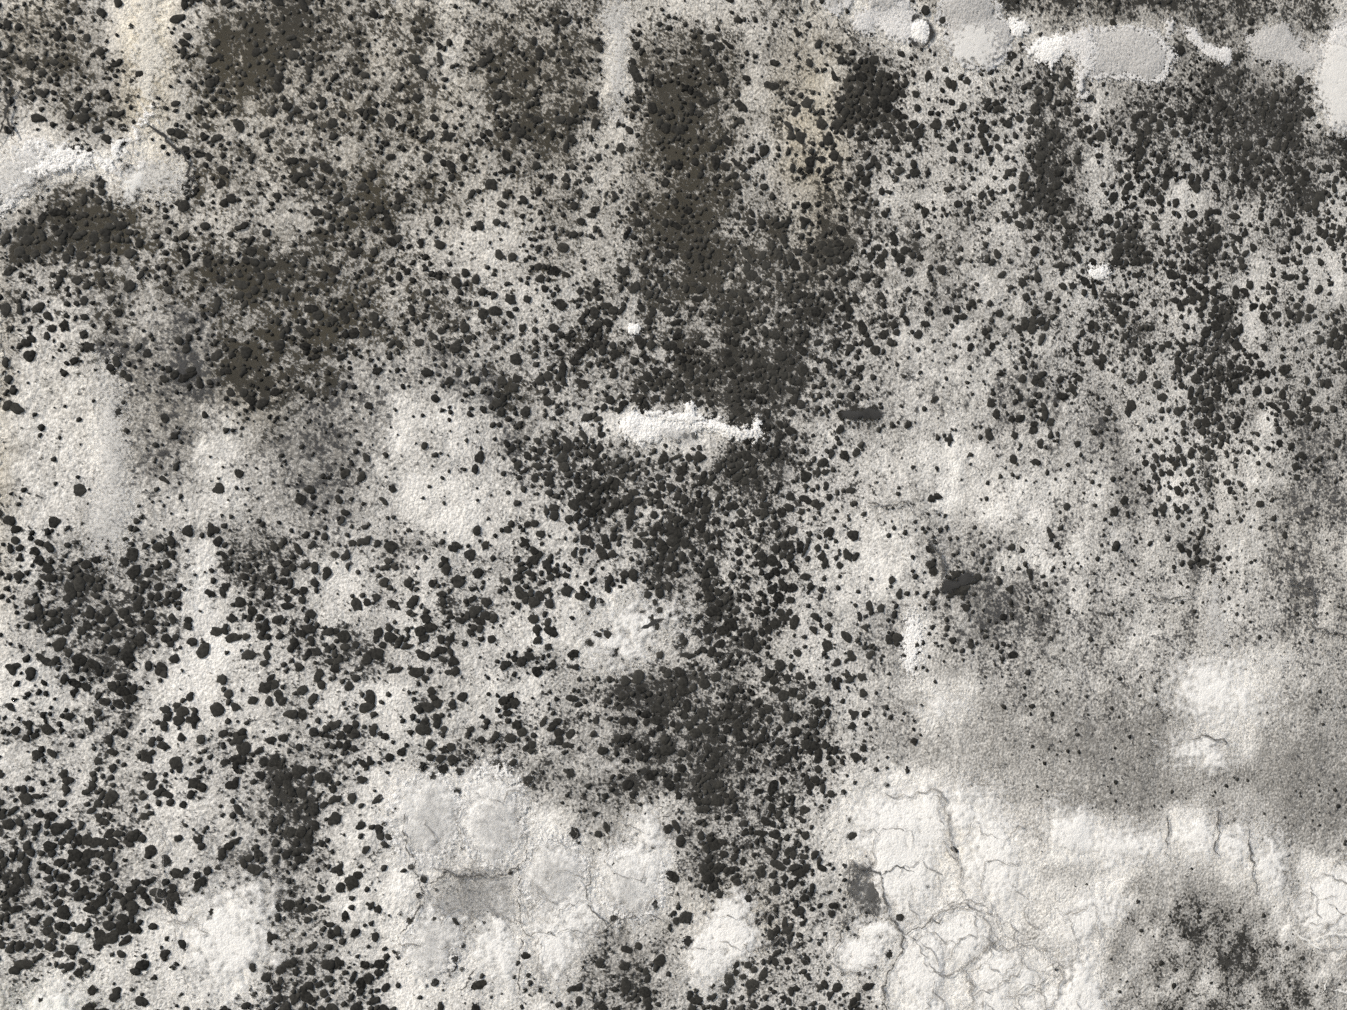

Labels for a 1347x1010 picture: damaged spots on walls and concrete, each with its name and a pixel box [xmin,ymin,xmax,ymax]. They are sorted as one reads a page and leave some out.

leakage [20,372,67,488]
leakage [196,477,224,500]
leakage [415,435,449,467]
spalling [616,400,768,449]
leakage [846,815,865,844]
crack [1213,811,1258,895]
leakage [1267,720,1347,881]
leakage [409,865,510,941]
crack [695,788,1136,1010]
leakage [1097,856,1347,1010]
crack [1295,857,1347,1010]